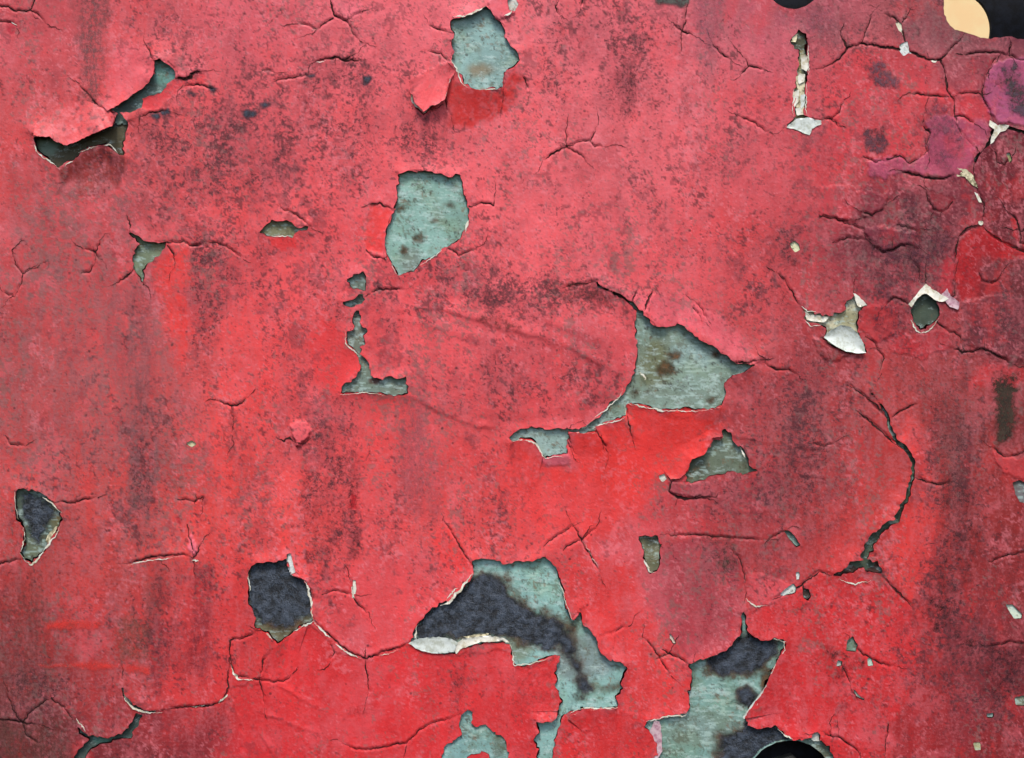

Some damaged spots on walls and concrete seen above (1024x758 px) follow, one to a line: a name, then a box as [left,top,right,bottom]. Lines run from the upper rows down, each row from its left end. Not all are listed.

peeling [24,46,195,182]
peeling [410,0,531,129]
crack [667,3,771,80]
peeling [329,160,483,411]
peeling [791,282,881,366]
crack [771,4,1024,607]
peeling [497,301,771,497]
crack [0,681,76,756]
crack [117,620,410,720]
peeling [235,551,328,668]
crack [332,711,473,754]
peeling [398,545,846,758]